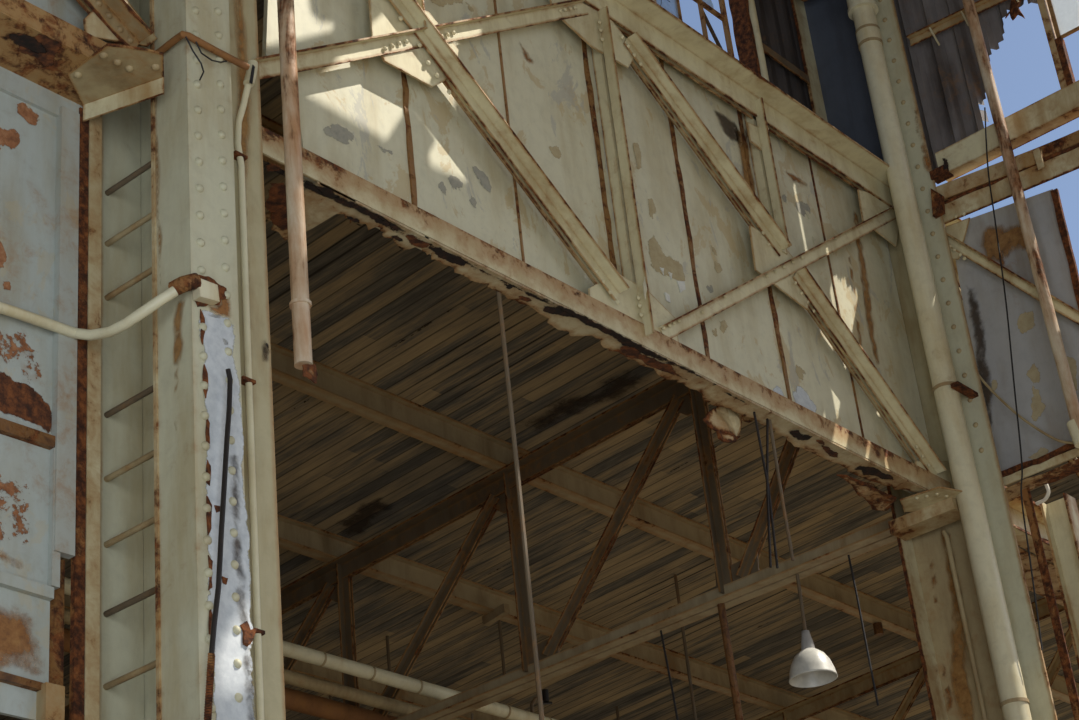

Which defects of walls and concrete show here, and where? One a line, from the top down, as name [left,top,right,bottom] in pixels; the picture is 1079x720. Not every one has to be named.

rust [9,33,62,67]
rust [922,146,949,170]
peeling [642,237,686,303]
rust [0,475,29,544]
peeling [199,309,255,720]
rust [0,611,33,666]